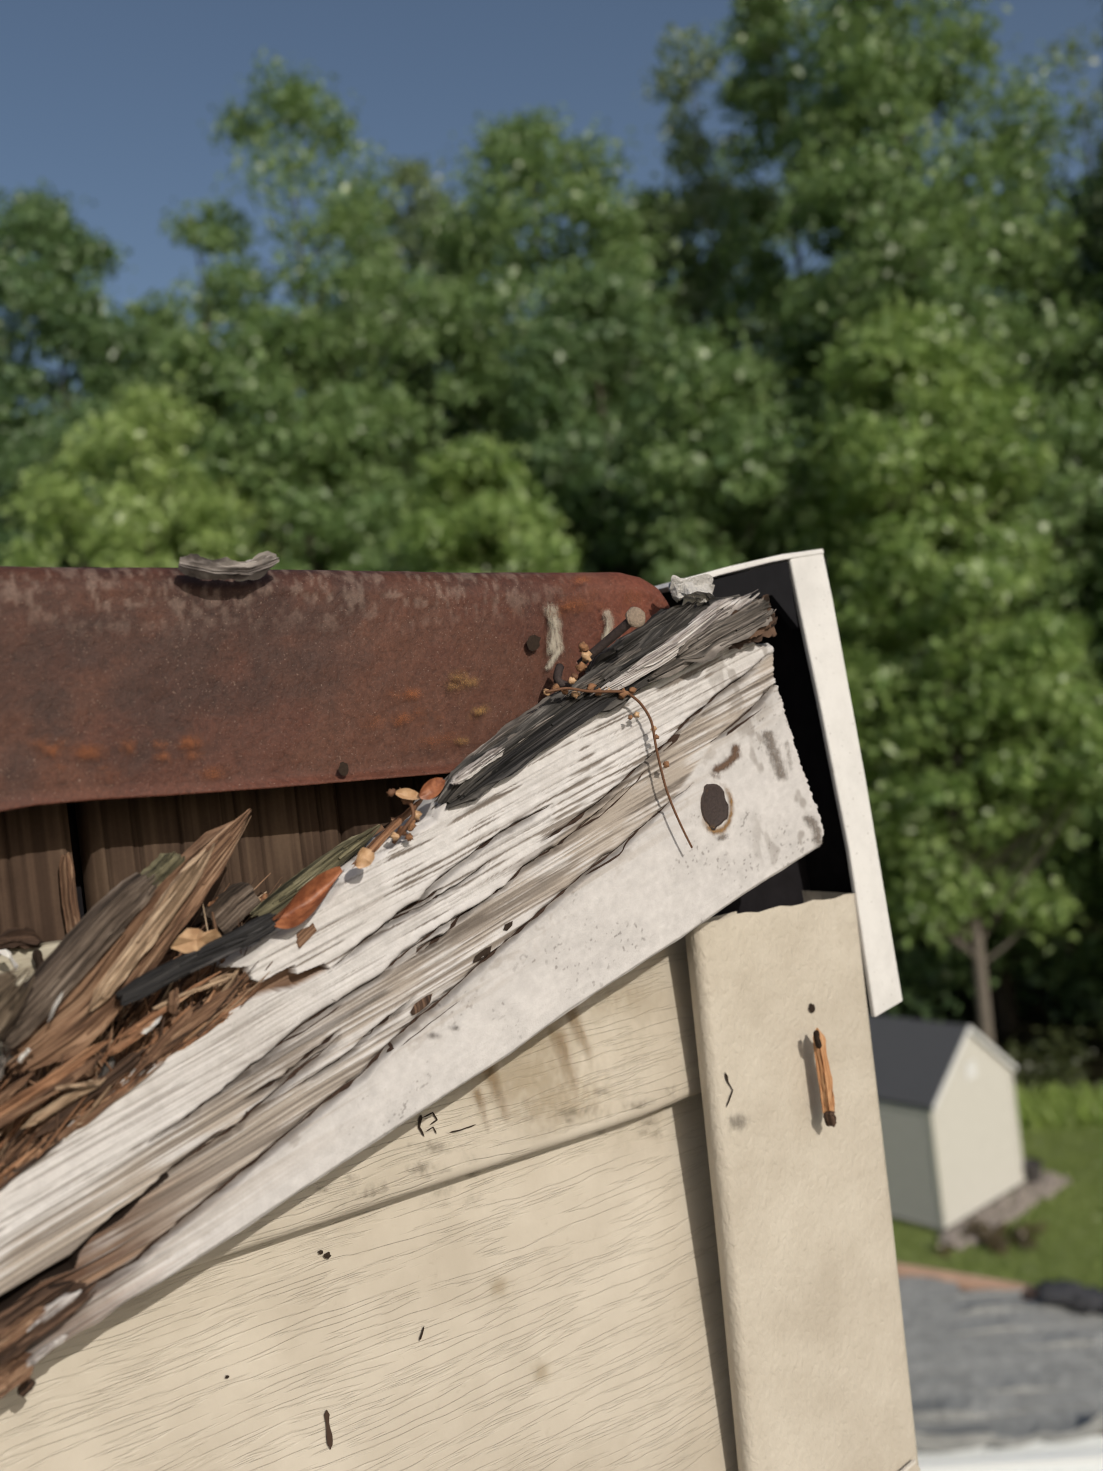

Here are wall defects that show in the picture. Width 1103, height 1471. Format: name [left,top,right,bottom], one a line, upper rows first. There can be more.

peeling [713,745,740,773]
peeling [764,731,785,778]
peeling [805,816,822,843]
peeling [0,949,43,971]
peeling [473,946,492,963]
peeling [410,993,433,1016]
peeling [418,1112,476,1136]